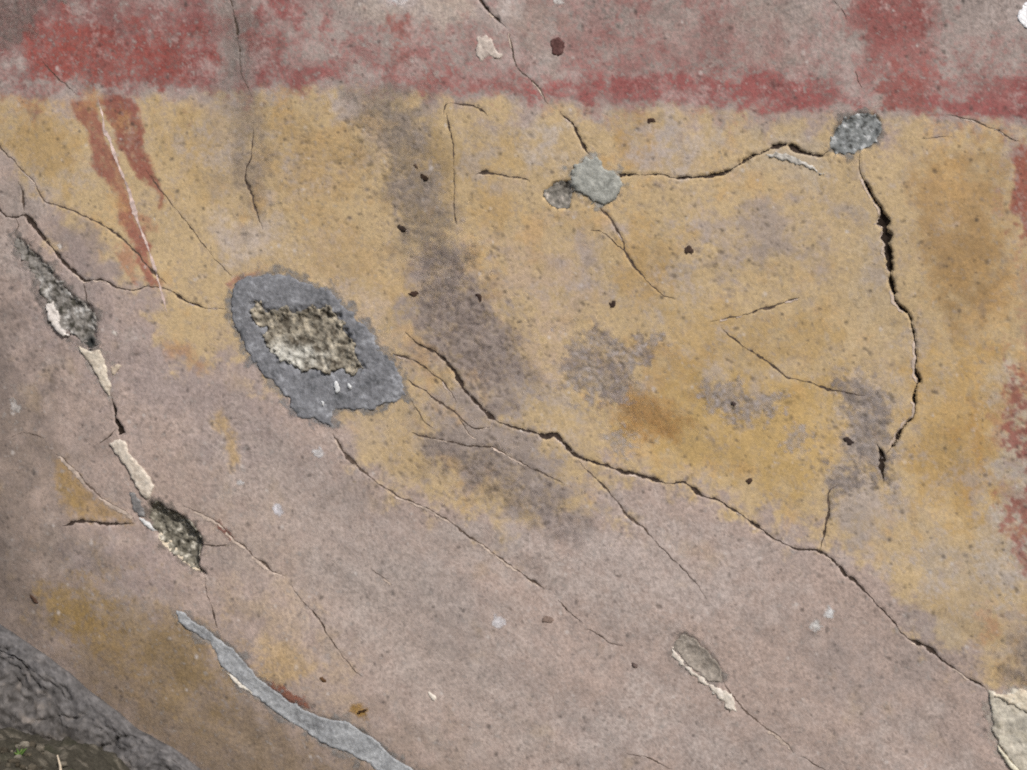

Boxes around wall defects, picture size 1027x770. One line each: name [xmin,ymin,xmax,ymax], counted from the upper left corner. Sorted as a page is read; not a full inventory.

crack [479,0,588,152]
crack [0,146,229,311]
spalling [543,180,572,209]
crack [620,143,831,179]
spalling [9,230,101,351]
crack [710,297,860,396]
crack [859,158,921,479]
crack [100,398,125,443]
spalling [129,492,205,574]
crack [333,434,623,646]
crack [393,333,988,691]
spalling [670,633,737,712]